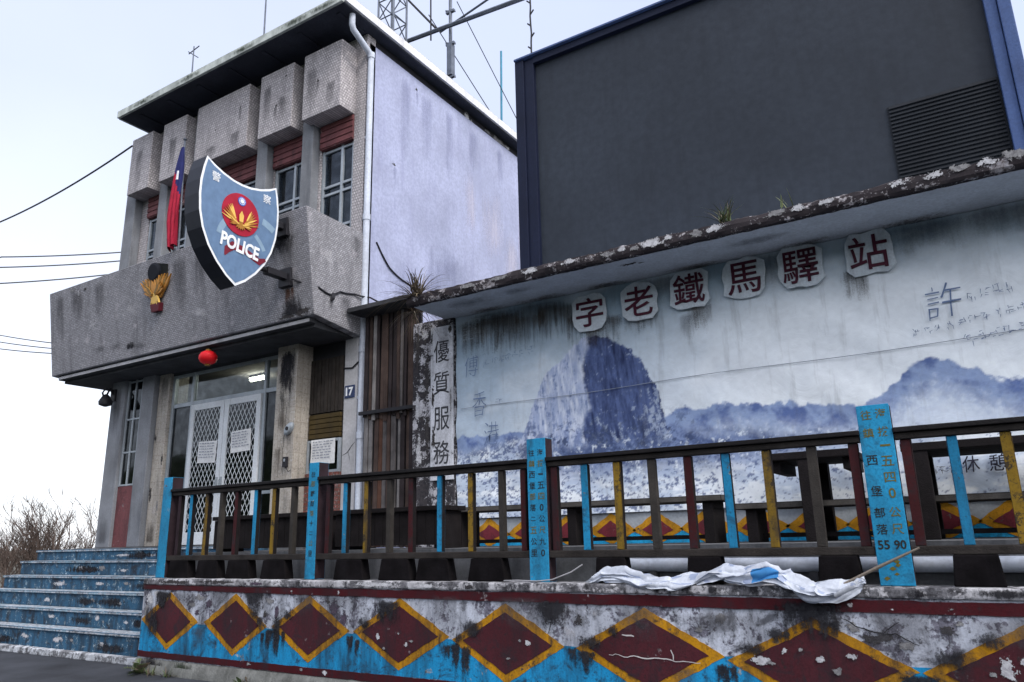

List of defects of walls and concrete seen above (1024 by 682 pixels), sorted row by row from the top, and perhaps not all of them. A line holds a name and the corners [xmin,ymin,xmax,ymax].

water stain [272,234,292,256]
water stain [280,351,295,427]
peeling [415,330,435,478]
peeling [325,591,347,626]
spalling [939,609,963,636]
spalling [845,622,915,652]
peeling [751,648,803,666]
peeling [815,653,857,676]
peeling [989,657,1024,682]